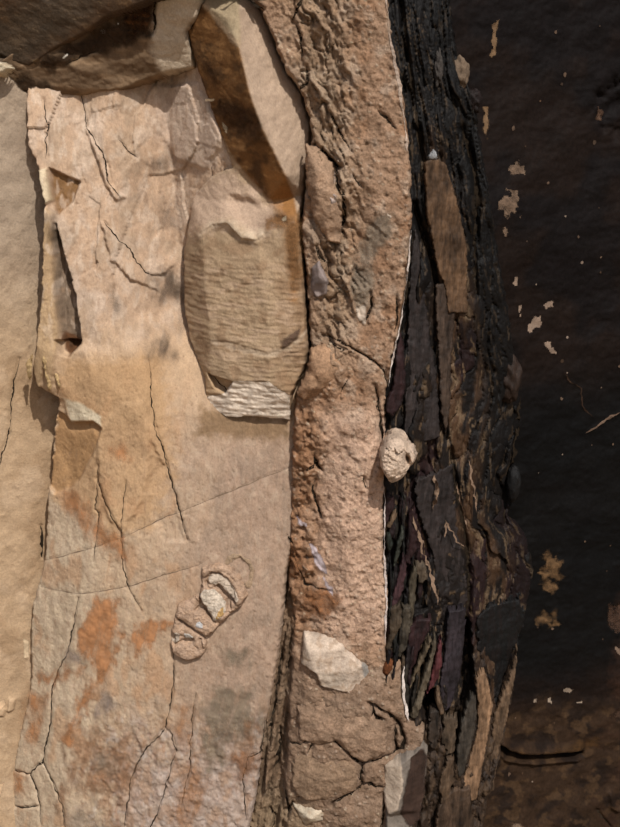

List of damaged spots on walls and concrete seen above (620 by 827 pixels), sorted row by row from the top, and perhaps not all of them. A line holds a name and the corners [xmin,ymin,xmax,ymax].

crack [15,364,328,827]
peeling [608,604,620,633]
crack [331,703,406,827]